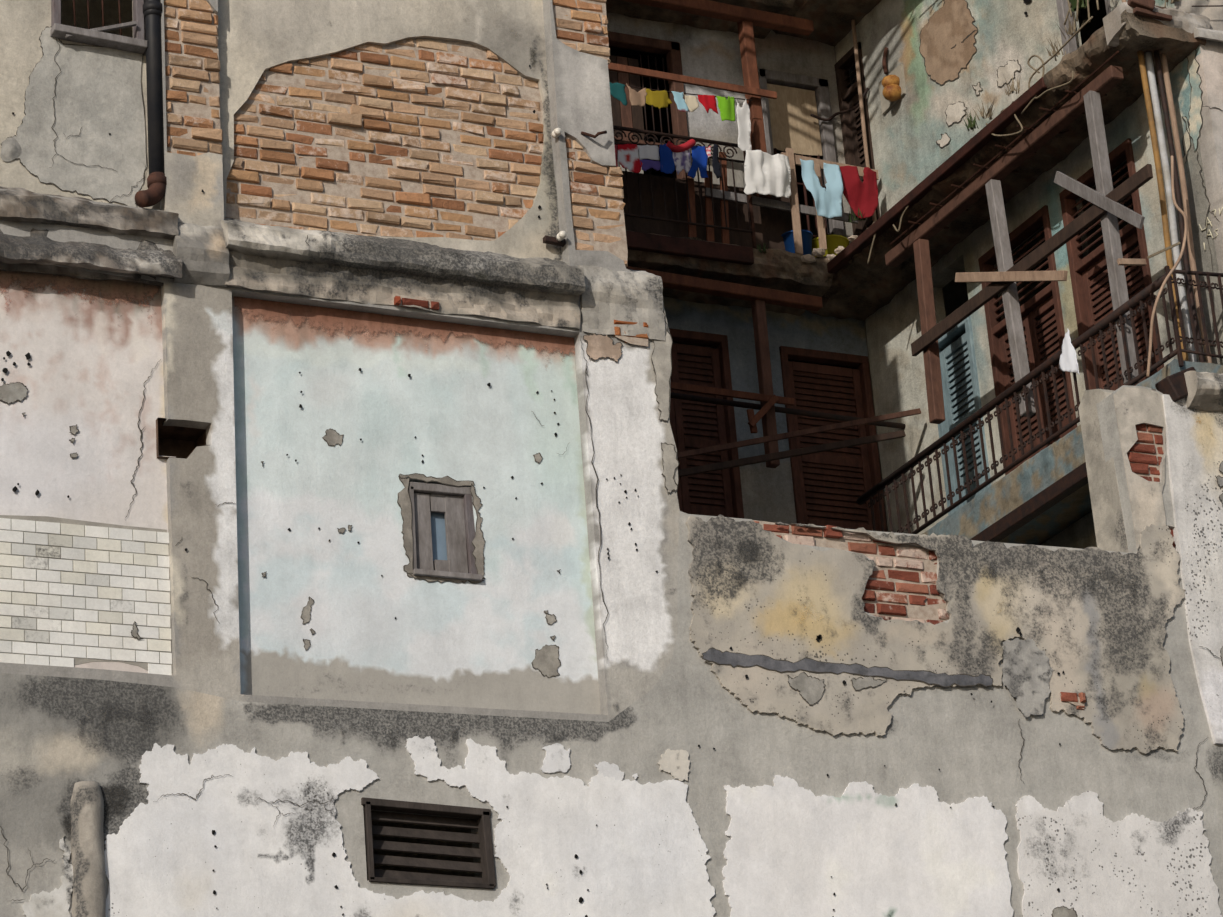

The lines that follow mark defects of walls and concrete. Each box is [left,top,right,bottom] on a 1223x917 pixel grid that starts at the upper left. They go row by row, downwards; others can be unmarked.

spalling [1,25,147,207]
crack [50,37,146,202]
flaking render [164,0,544,241]
spalling [919,0,978,85]
peeling [936,59,1022,148]
crack [125,361,159,518]
flaking render [1127,424,1164,482]
peeling [686,515,1185,754]
mould [101,785,129,823]
peeling [104,735,1222,917]